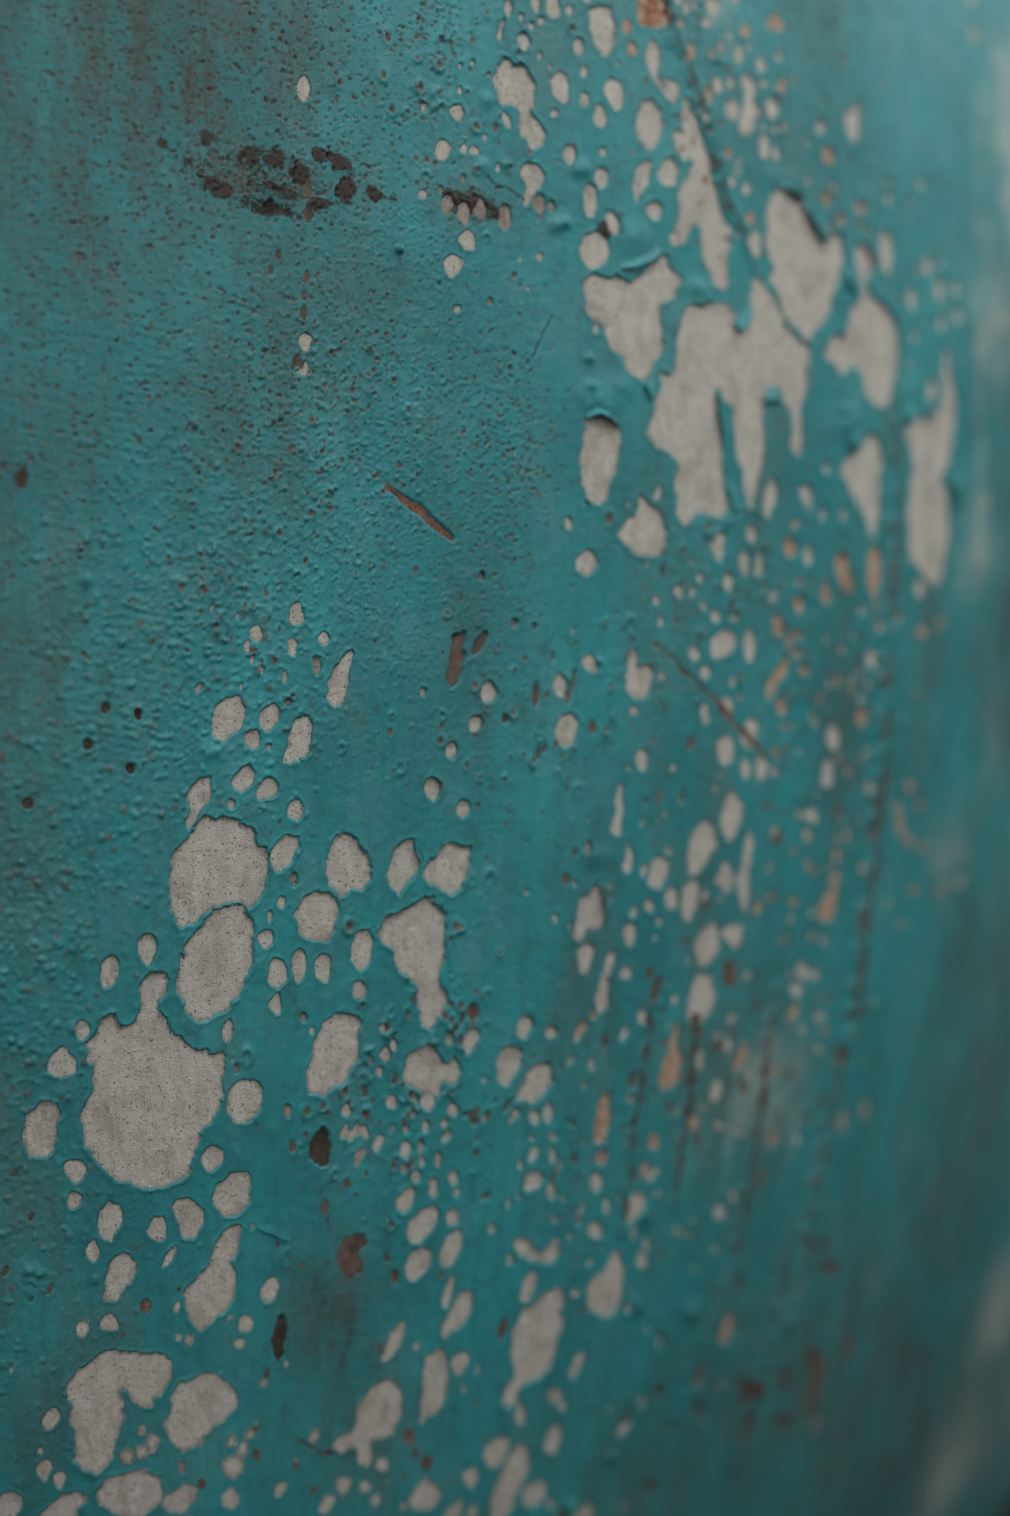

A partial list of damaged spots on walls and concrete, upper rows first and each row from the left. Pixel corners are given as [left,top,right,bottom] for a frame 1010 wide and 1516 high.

peeling [294,72,310,102]
crack [662,0,757,269]
peeling [291,270,312,376]
peeling [14,466,29,488]
spalling [384,481,454,541]
peeling [418,0,965,1148]
peeling [211,602,312,764]
peeling [313,632,353,707]
peeling [21,798,33,809]
peeling [22,1101,61,1158]
peeling [36,765,664,1516]
peeling [0,1491,23,1516]